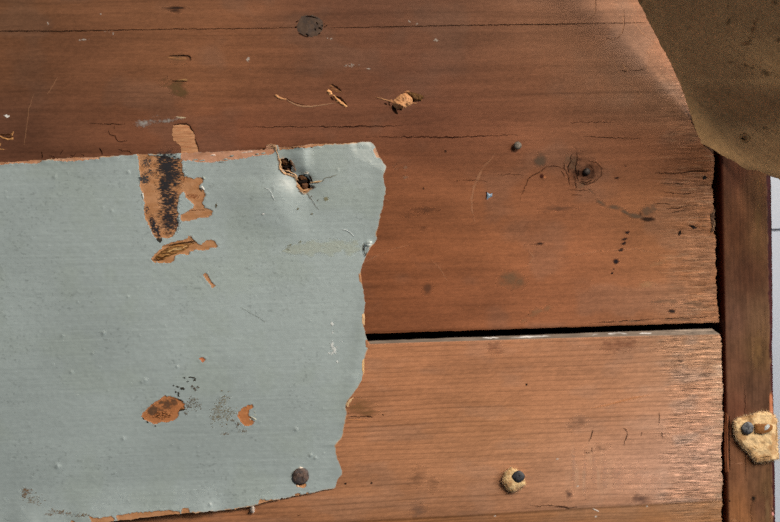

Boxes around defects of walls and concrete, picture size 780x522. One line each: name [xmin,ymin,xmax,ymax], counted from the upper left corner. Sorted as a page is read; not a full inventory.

crack [8,26,196,34]
crack [337,21,591,29]
crack [320,125,515,138]
peeling [137,144,325,263]
peeling [141,395,185,427]
peeling [237,404,257,426]
peeling [89,508,190,522]